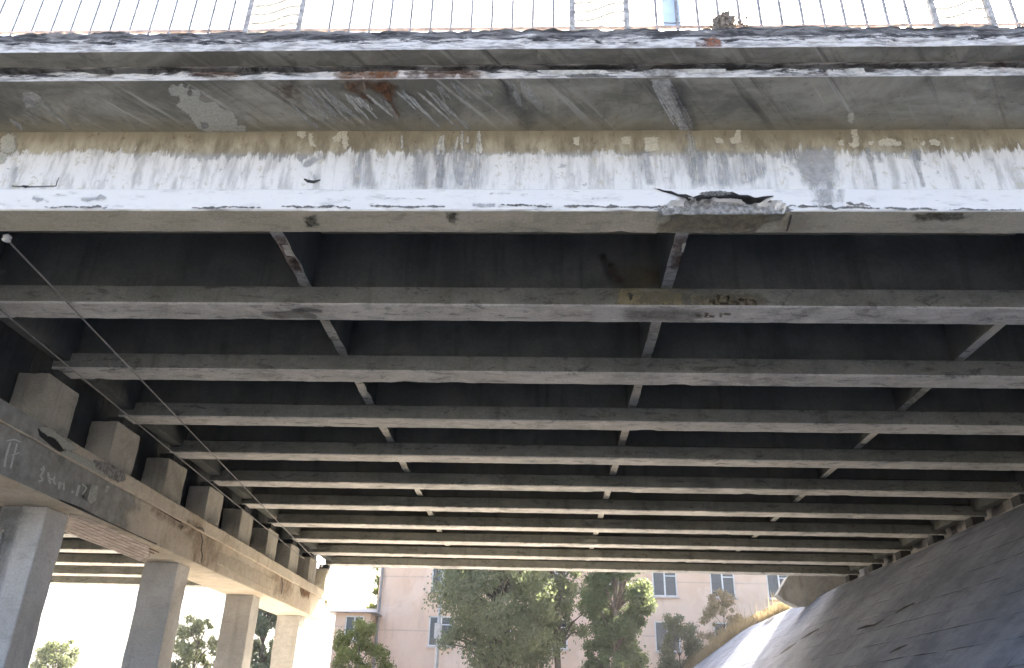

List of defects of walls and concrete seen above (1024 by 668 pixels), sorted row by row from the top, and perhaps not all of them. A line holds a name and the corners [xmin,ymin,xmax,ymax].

peeling [168,83,247,132]
water stain [291,84,490,187]
rust [335,71,480,117]
peeling [621,135,660,153]
peeling [713,130,744,144]
peeling [837,112,903,149]
water stain [793,149,835,206]
spalling [473,189,1021,233]
spalling [38,426,126,483]